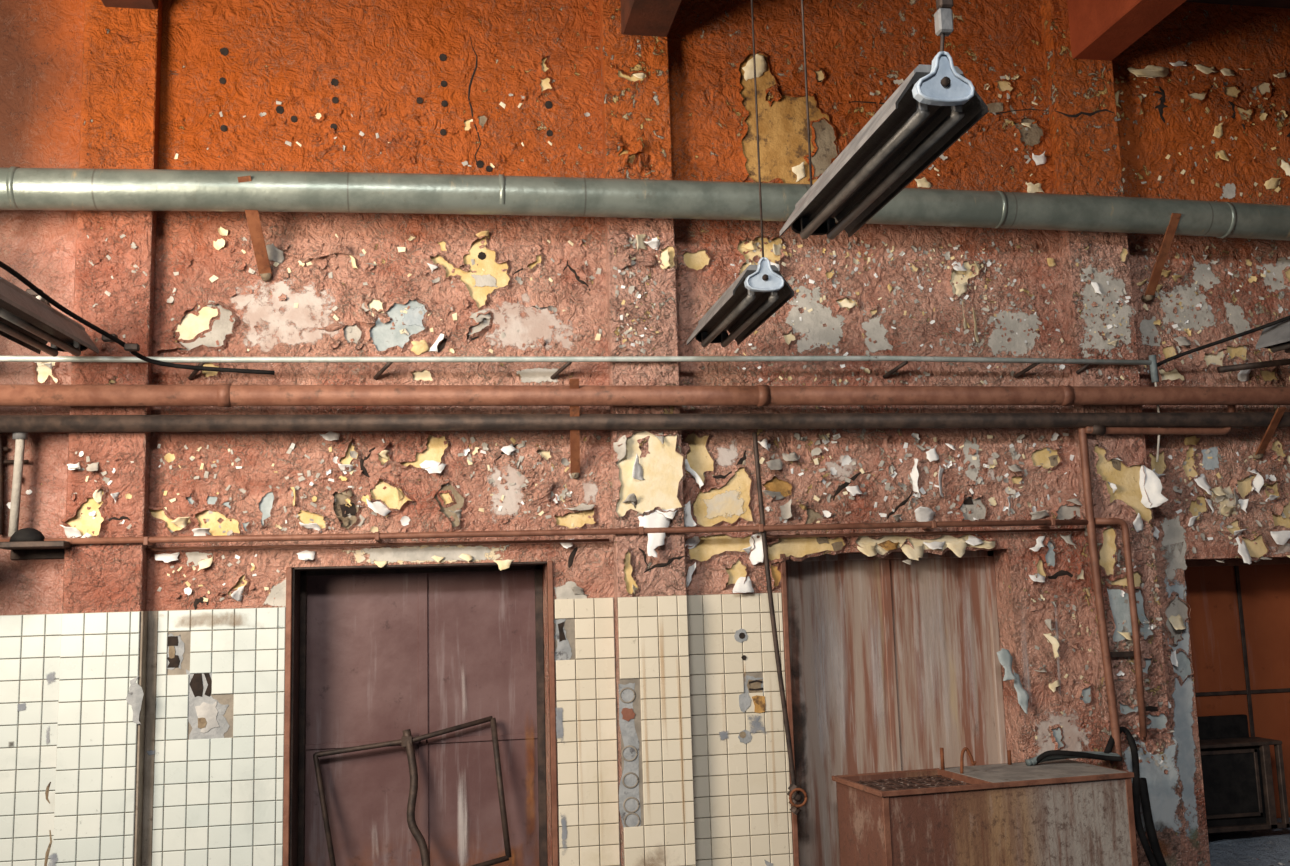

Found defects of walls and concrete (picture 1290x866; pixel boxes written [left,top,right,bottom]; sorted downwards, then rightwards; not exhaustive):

crack [468,37,481,168]
peeling [735,50,842,184]
crack [1154,86,1168,123]
peeling [32,362,63,384]
peeling [153,226,714,385]
peeling [730,234,1290,386]
peeling [60,451,134,555]
spalling [126,676,144,724]